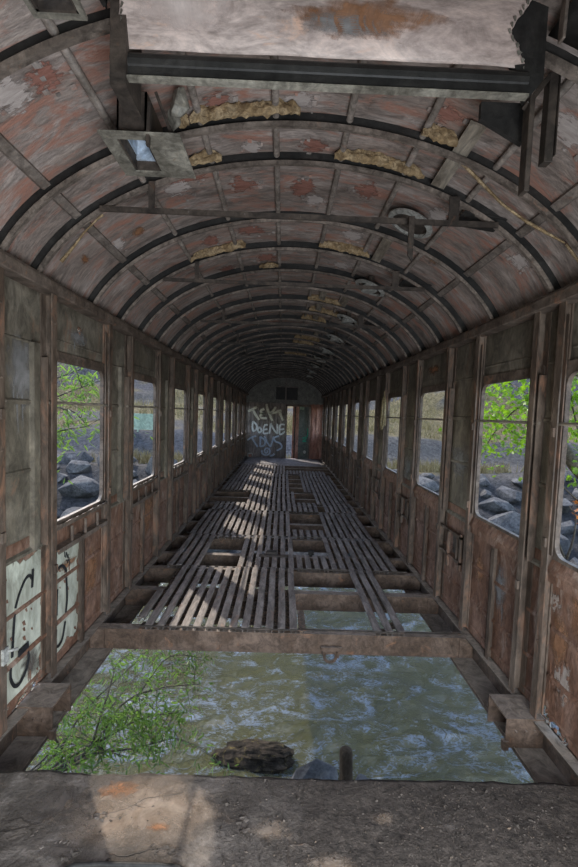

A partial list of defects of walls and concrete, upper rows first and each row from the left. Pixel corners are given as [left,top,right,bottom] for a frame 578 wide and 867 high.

peeling [0,61,78,119]
peeling [557,112,578,162]
peeling [551,661,570,706]